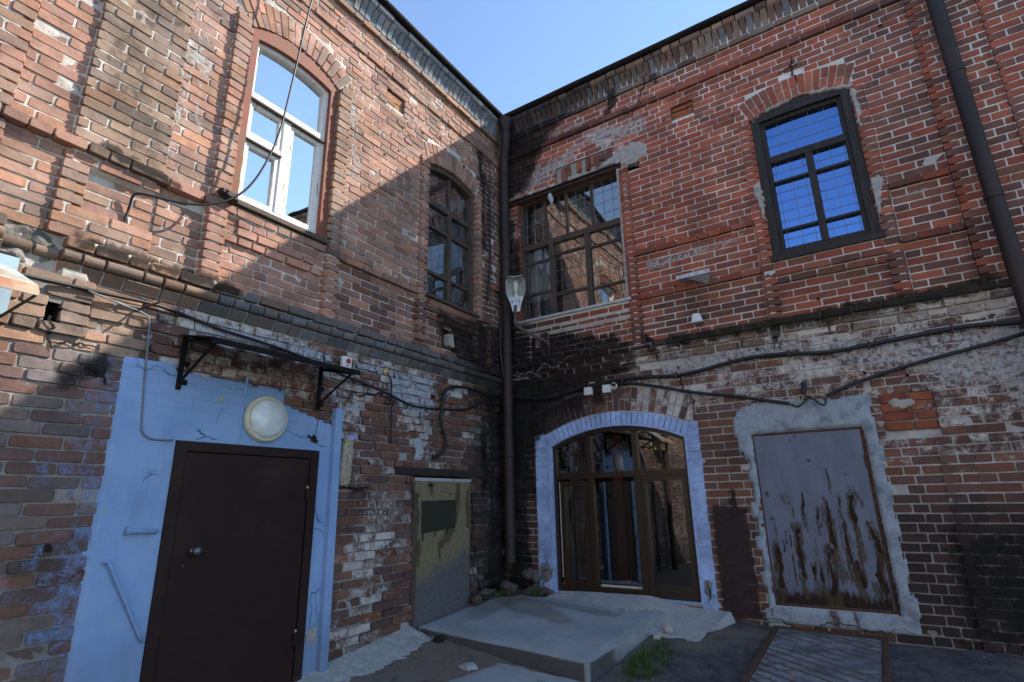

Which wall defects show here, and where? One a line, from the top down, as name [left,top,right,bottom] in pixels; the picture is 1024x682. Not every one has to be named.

crack [777,56,797,85]
spalling [556,147,613,184]
peeling [188,326,332,379]
peeling [353,361,449,420]
peeling [656,339,807,374]
peeling [826,327,1024,406]
corrosion [770,471,894,628]